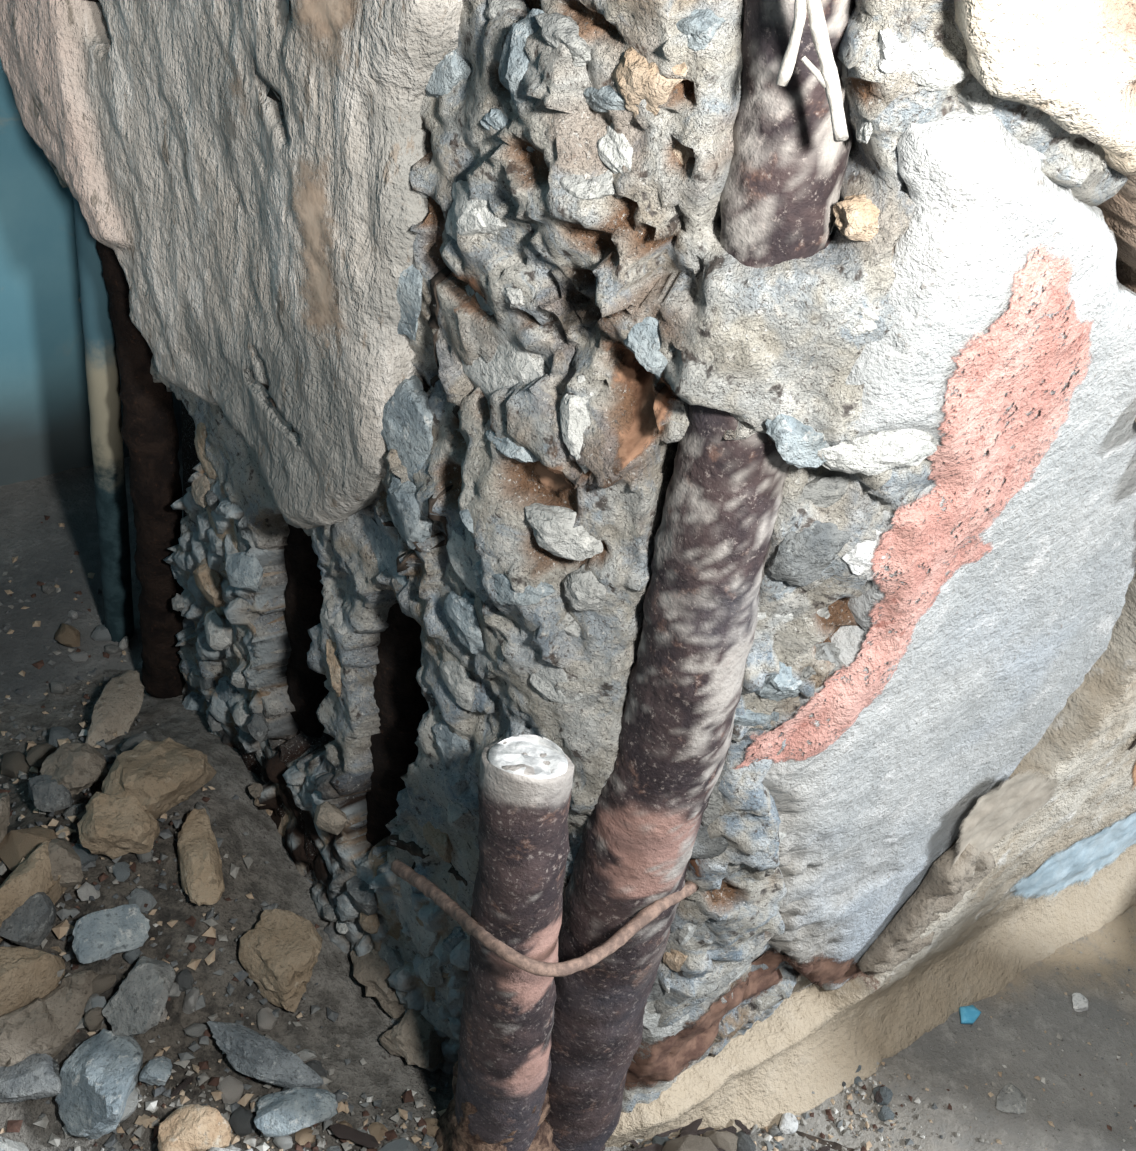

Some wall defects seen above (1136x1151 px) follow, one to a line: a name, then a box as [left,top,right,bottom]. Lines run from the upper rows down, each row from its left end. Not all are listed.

crack [267,87,282,102]
crack [261,383,299,435]
rust [532,461,573,493]
spalling [205,603,250,664]
spalling [277,800,325,886]
peeling [1014,812,1136,899]
spalling [822,978,850,990]
spalling [435,935,560,1151]
rust [625,950,881,1090]